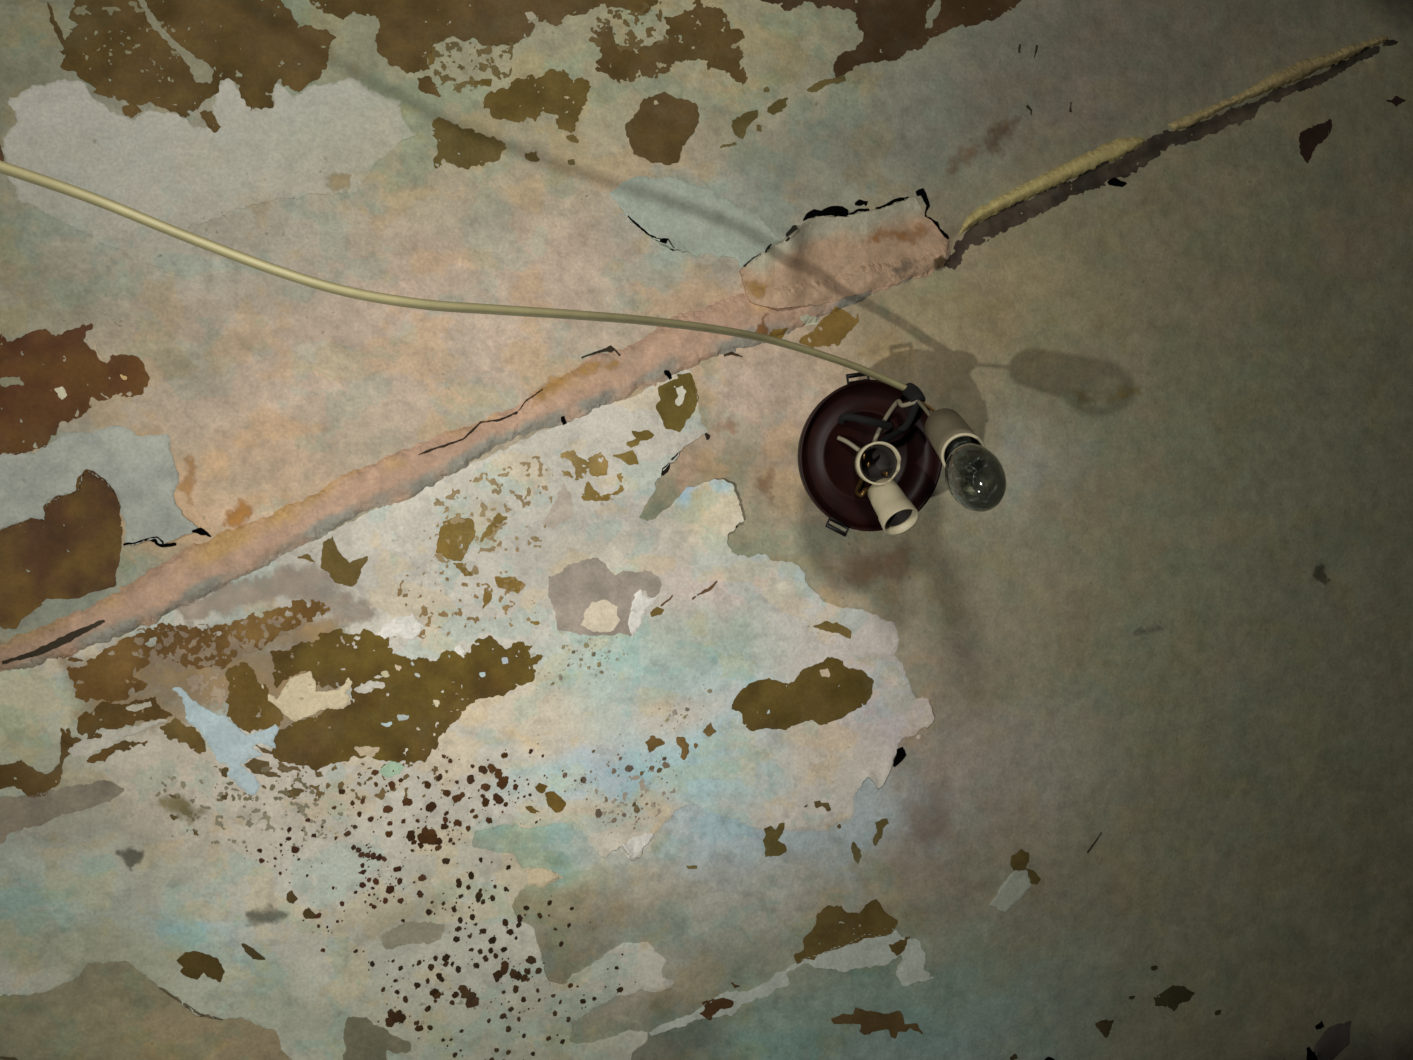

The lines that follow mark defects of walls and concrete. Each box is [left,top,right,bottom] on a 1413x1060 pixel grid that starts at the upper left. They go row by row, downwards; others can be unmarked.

peeling [761,0,1021,92]
peeling [0,0,788,282]
peeling [1299,119,1332,163]
crack [581,345,621,358]
crack [418,388,543,455]
peeling [0,324,198,629]
crack [2,620,105,665]
peeling [0,370,934,1060]
peeling [1314,1021,1351,1060]